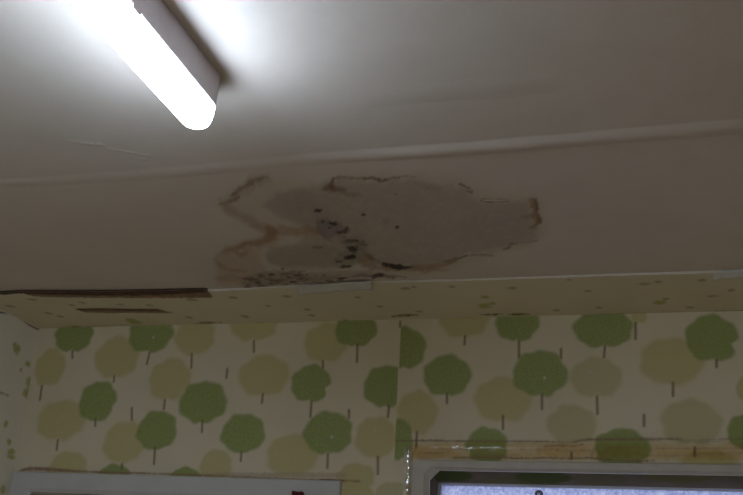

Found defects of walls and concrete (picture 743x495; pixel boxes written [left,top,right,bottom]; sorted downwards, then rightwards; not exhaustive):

leakage [211,163,553,289]